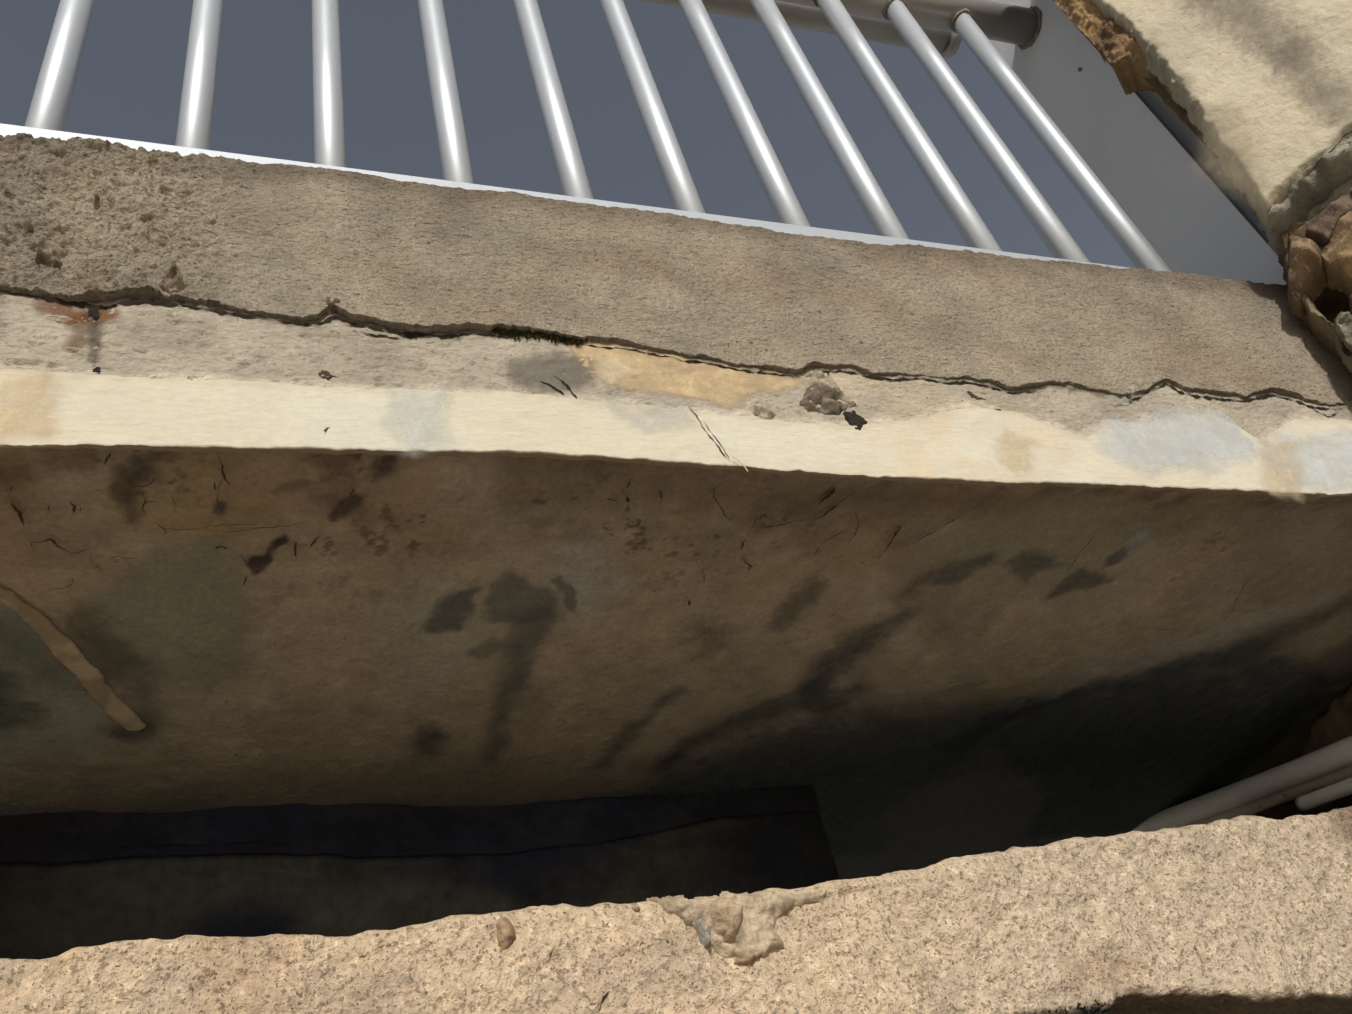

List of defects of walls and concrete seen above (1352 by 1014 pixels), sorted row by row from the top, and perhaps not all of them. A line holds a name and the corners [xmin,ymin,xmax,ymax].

crack [0,290,506,339]
crack [569,341,1042,394]
crack [1128,382,1342,417]
water stain [1049,530,1148,598]
water stain [428,574,575,760]